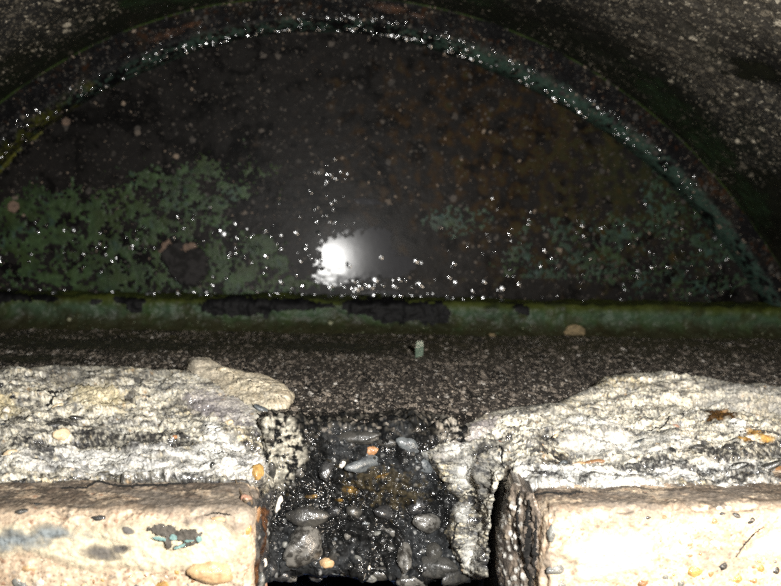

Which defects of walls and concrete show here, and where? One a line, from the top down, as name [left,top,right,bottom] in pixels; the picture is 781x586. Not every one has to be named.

spalling [257,407,478,586]